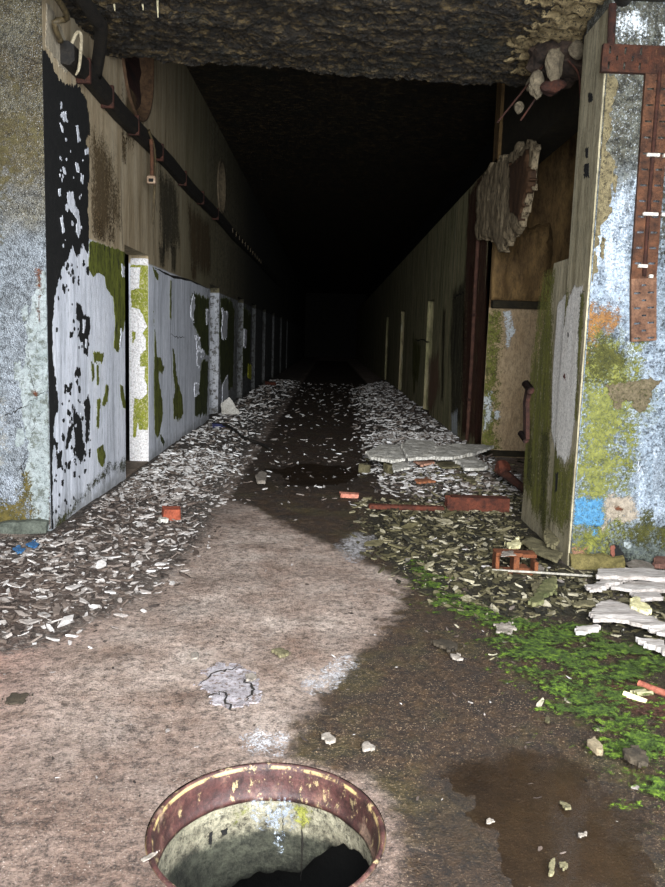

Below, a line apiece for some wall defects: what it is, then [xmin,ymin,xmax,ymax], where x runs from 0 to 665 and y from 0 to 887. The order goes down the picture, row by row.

spalling [497,0,604,123]
flaking render [0,3,183,531]
peeling [190,291,251,418]
spalling [606,376,662,413]
spalling [609,541,631,567]